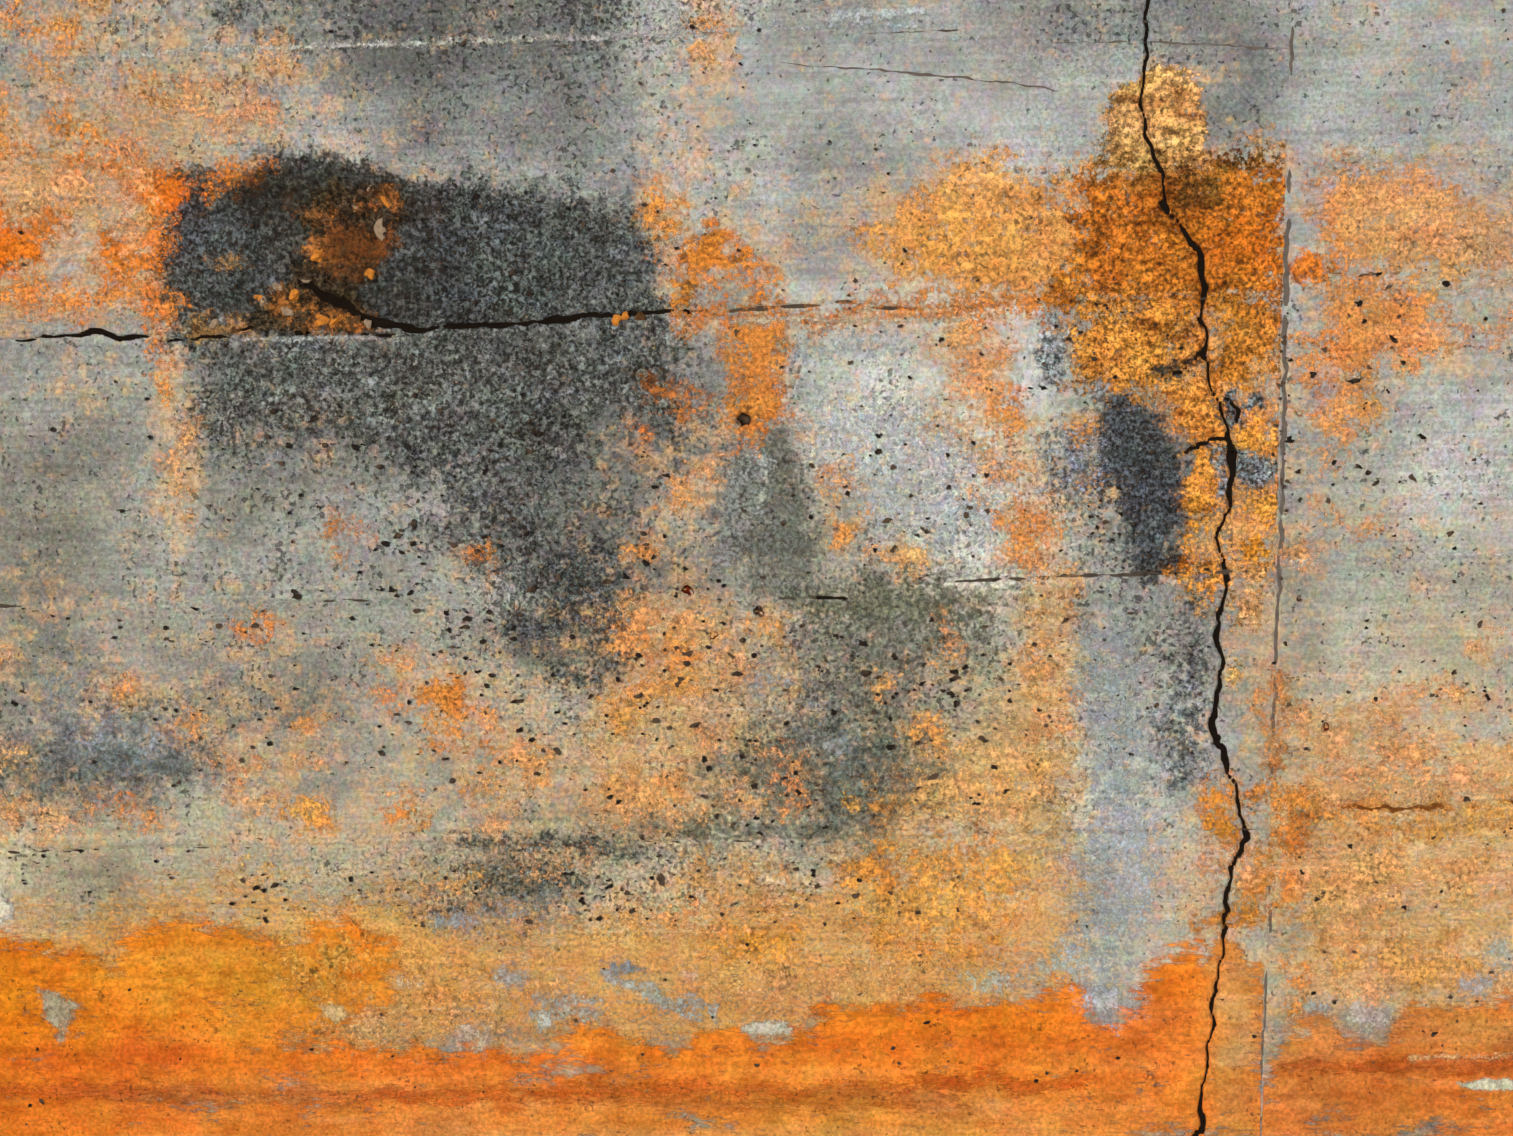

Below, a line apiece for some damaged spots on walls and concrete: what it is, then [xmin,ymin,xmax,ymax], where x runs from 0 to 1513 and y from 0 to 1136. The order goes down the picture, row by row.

crack [12,326,255,343]
rust [0,33,299,407]
rust [155,415,203,524]
crack [294,280,690,339]
damp [146,141,1019,935]
damp [494,958,719,1034]
rust [0,484,1513,1136]
crack [782,62,1056,92]
damp [1033,310,1076,383]
rust [637,64,1513,633]
damp [947,389,1277,1036]
crack [1054,0,1288,1136]